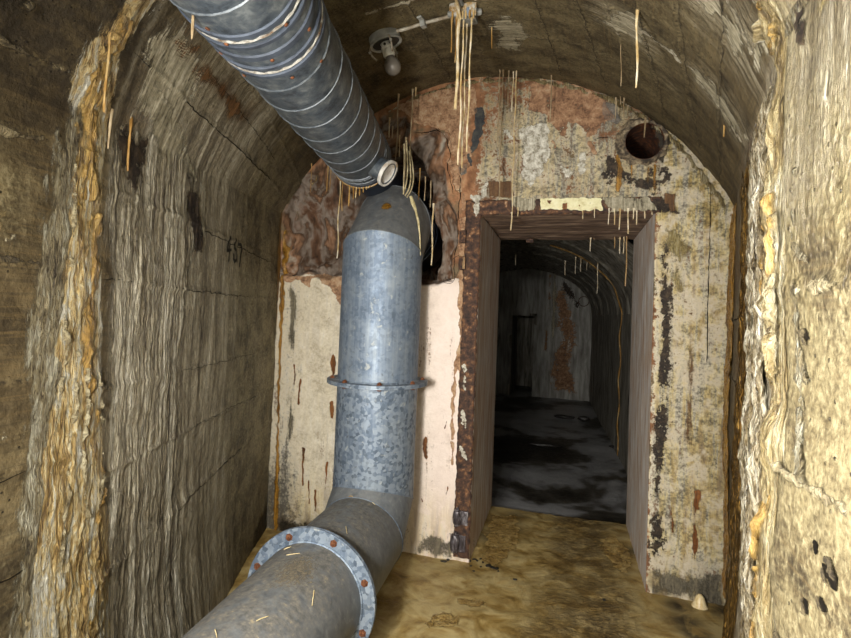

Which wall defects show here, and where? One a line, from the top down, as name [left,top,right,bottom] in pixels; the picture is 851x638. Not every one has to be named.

flaking render [504,81,614,187]
peeling [540,197,603,211]
corrosion [302,447,317,511]